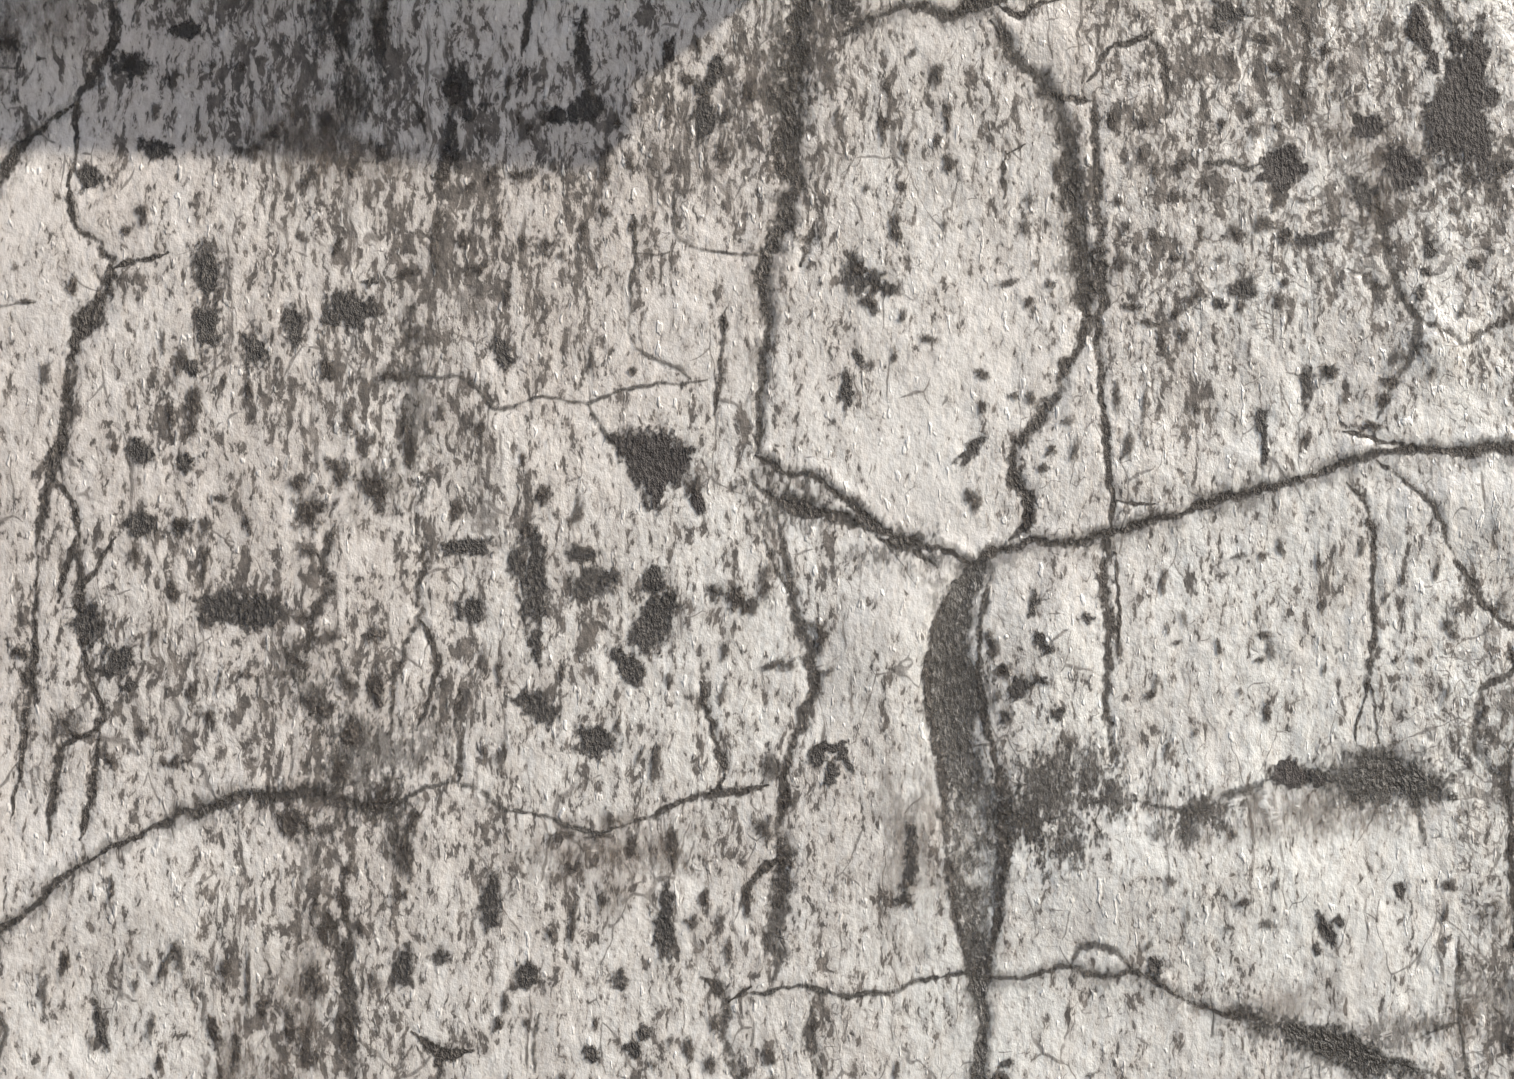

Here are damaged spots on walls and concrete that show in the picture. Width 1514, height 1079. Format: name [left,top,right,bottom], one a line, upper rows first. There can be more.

crack [520,0,538,57]
crack [0,0,169,842]
crack [672,0,1514,1079]
crack [0,681,770,933]
crack [0,1018,9,1058]
crack [327,880,362,1079]
crack [410,1030,475,1079]
crack [532,1013,540,1073]